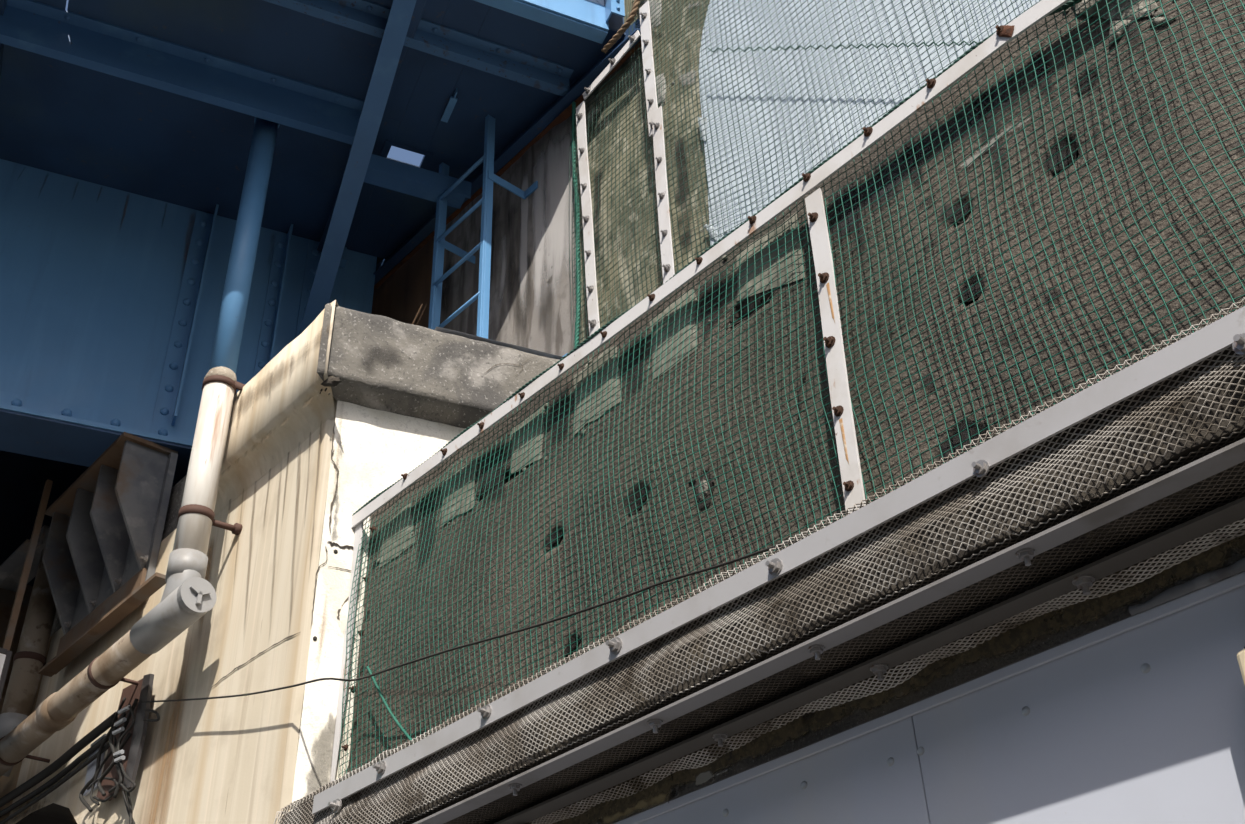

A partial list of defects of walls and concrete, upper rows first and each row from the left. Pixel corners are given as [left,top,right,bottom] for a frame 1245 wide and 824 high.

spalling [1062,0,1176,47]
damp [479,136,573,324]
damp [675,139,690,245]
damp [442,264,451,310]
crack [211,421,365,688]